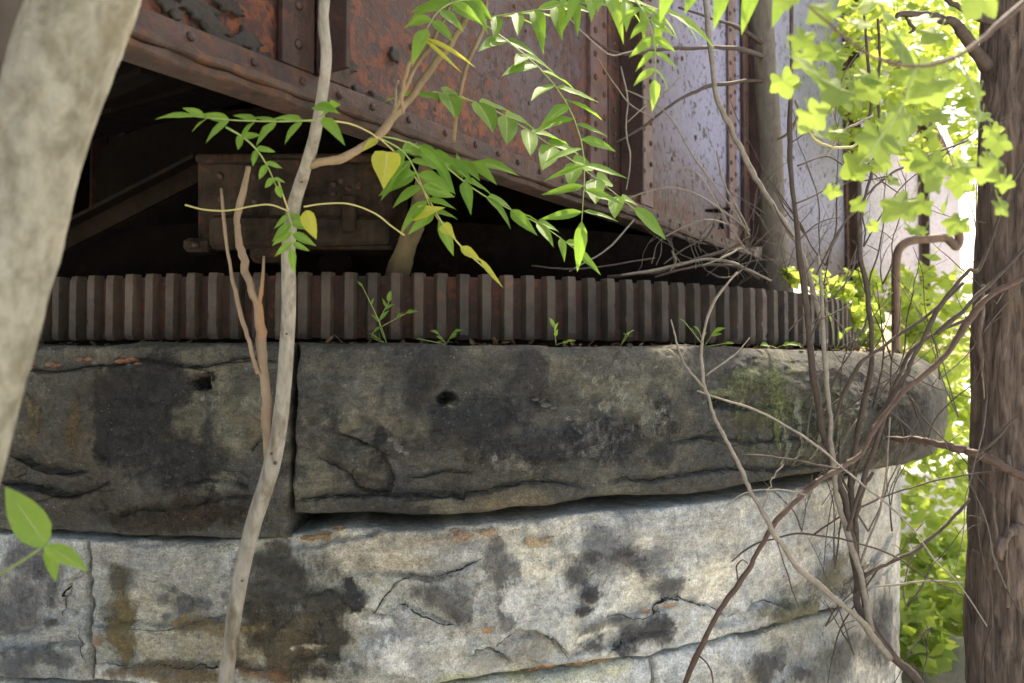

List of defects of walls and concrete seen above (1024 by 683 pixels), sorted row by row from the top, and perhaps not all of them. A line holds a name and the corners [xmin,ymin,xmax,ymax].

crack [1,455,115,502]
leakage [64,353,246,534]
crack [292,432,571,503]
leakage [403,349,680,469]
crack [610,430,798,485]
leakage [733,364,821,466]
crack [372,559,481,626]
leakage [235,525,690,682]
crack [606,596,806,656]